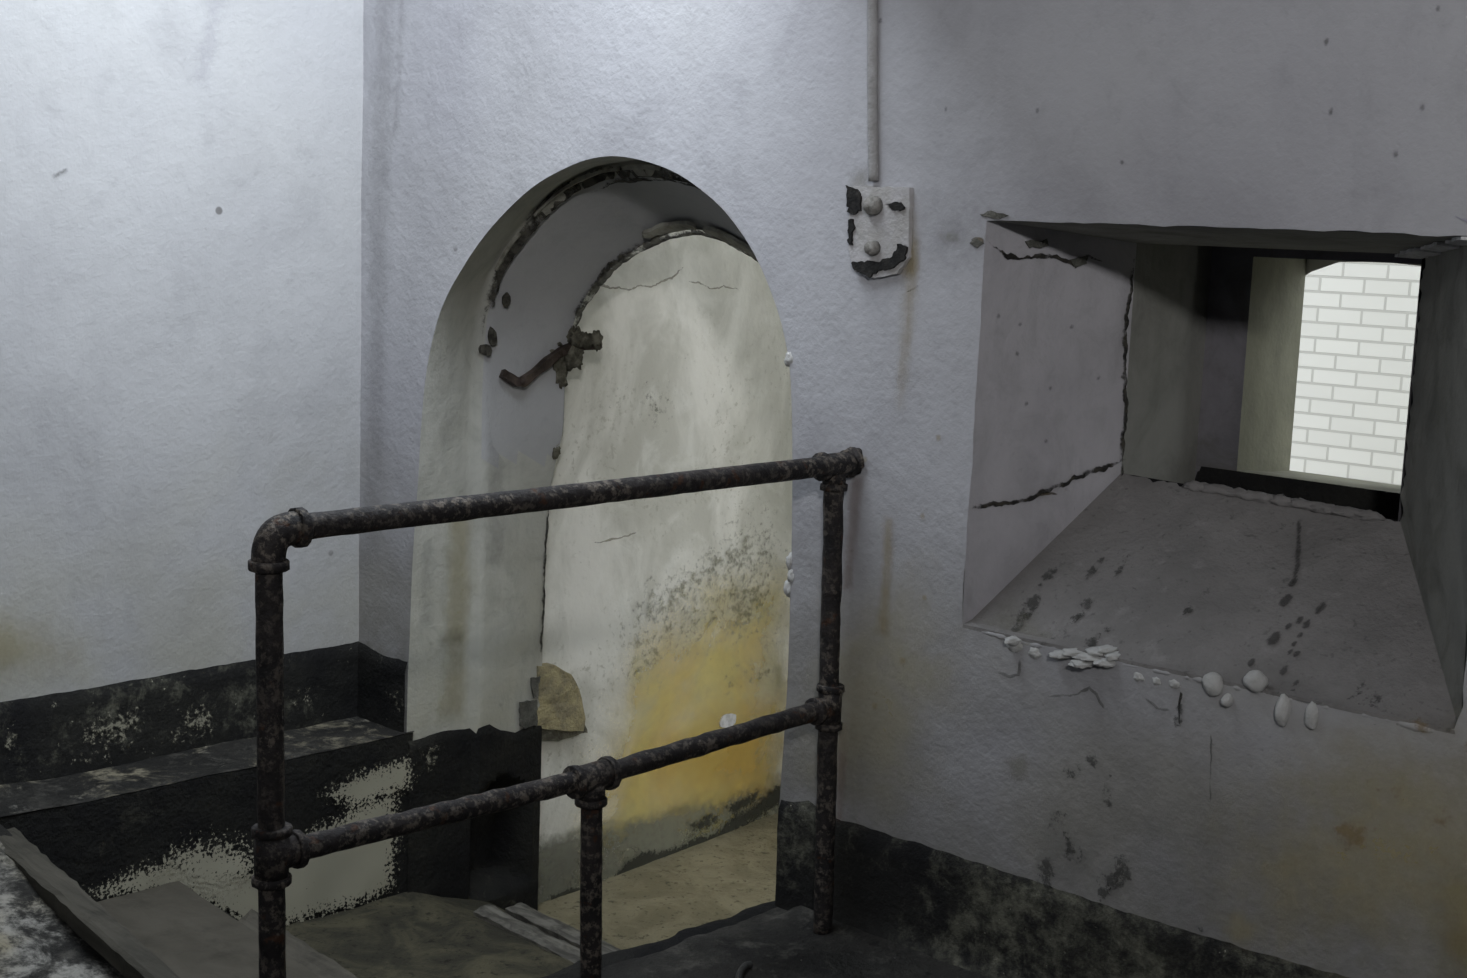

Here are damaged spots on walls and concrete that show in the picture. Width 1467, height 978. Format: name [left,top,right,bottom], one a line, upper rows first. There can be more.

spalling [550,221,758,389]
crack [970,211,1133,509]
peeling [1395,216,1467,259]
leakage [628,524,769,676]
leakage [614,786,781,877]
leakage [1098,855,1131,898]